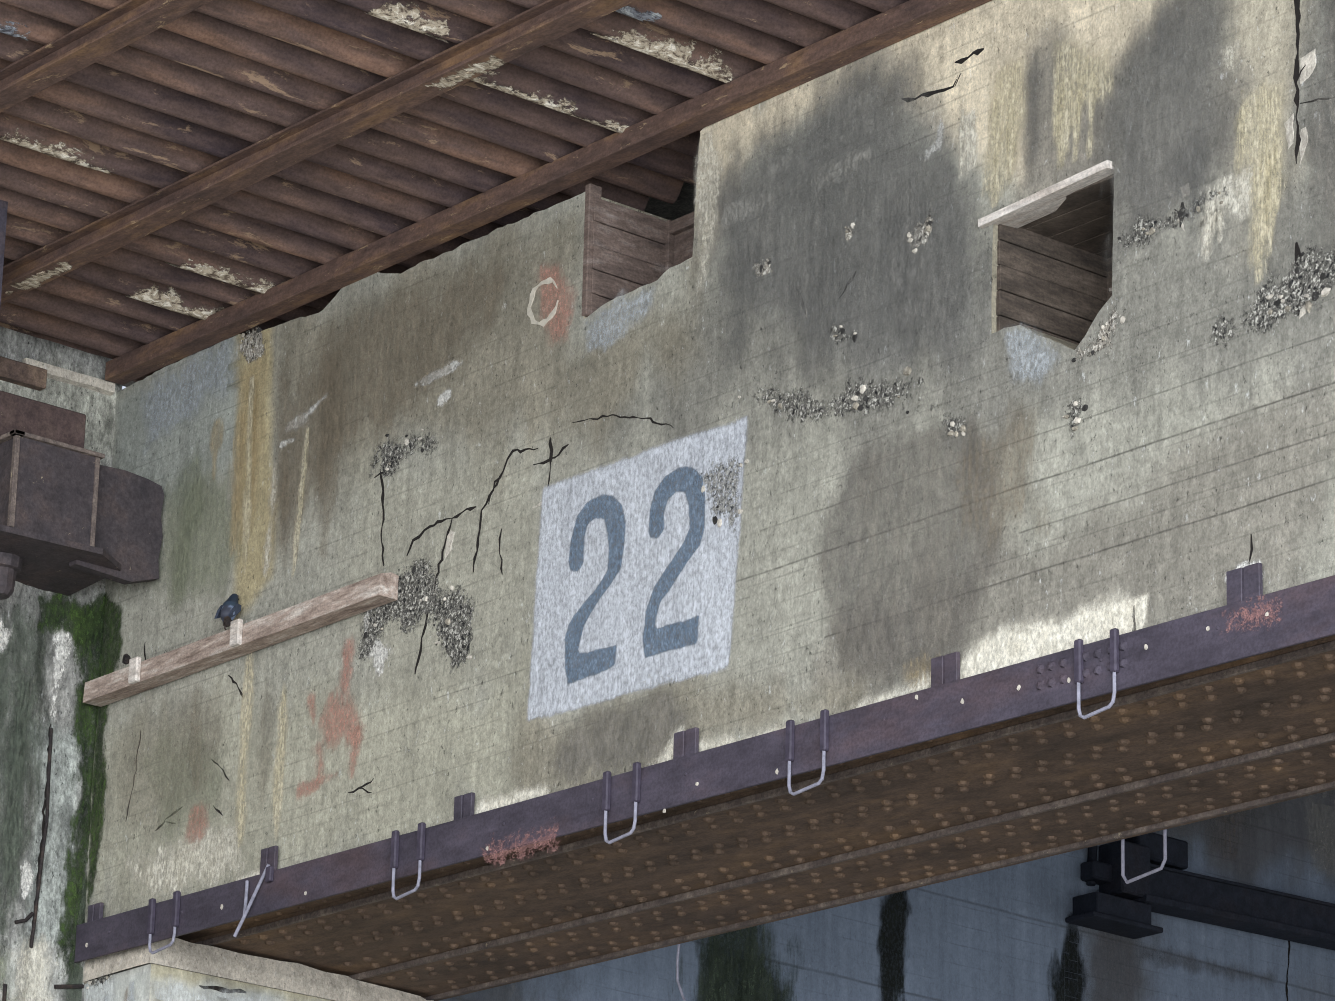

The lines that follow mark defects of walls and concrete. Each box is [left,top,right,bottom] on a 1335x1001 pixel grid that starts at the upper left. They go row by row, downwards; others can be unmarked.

leakage [958,62,1026,205]
crack [1284,0,1334,164]
leakage [697,135,834,302]
spalling [1210,240,1335,349]
spalling [356,555,475,675]
crack [374,414,672,674]
leakage [824,431,990,708]
spalling [14,728,53,948]
spalling [0,980,10,1001]
leakage [698,928,780,1001]